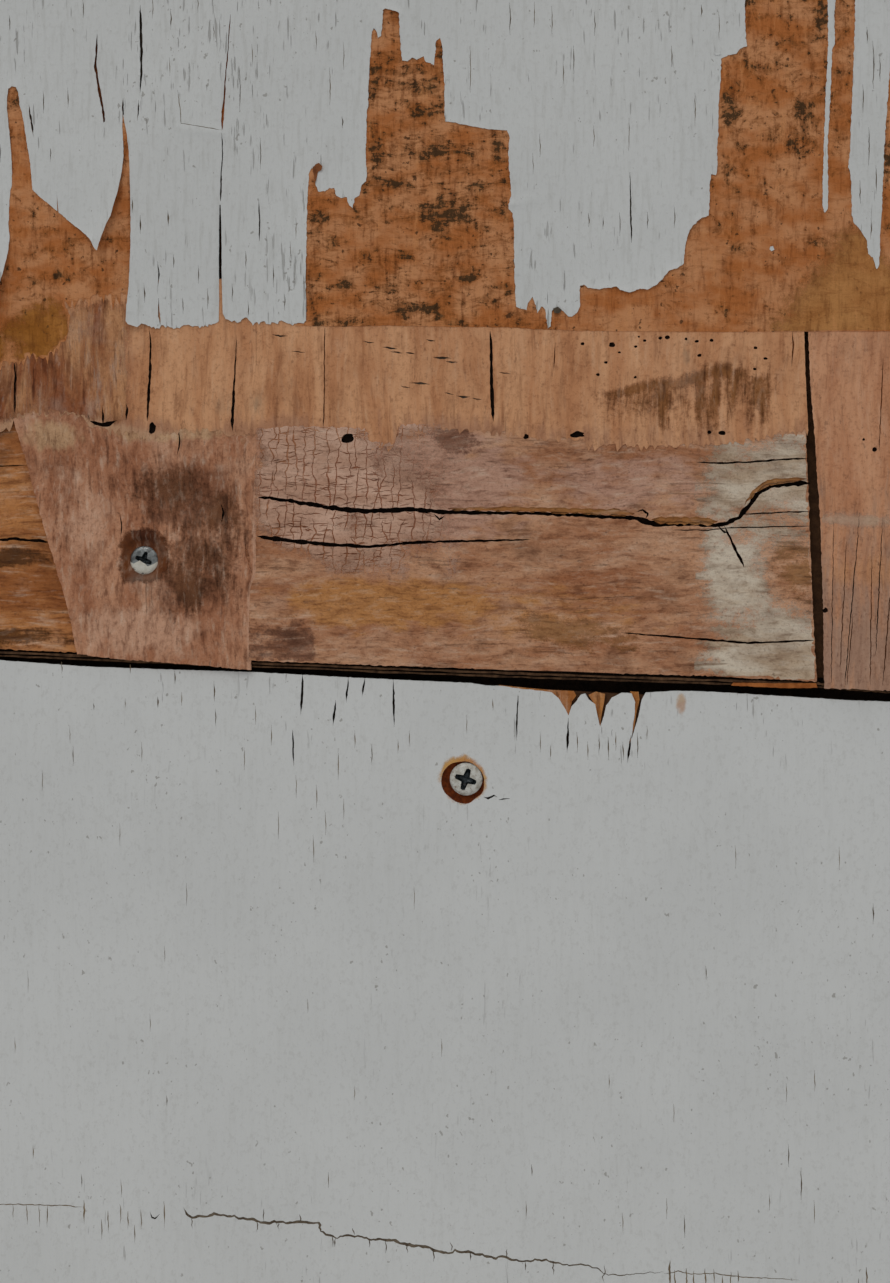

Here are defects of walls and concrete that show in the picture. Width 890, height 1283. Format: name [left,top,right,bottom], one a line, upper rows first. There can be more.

peeling [0,69,138,370]
peeling [296,0,890,332]
water stain [135,471,246,612]
crack [258,458,810,567]
peeling [499,685,605,725]
peeling [630,691,640,741]
rust [441,755,486,804]
crack [0,1175,790,1283]